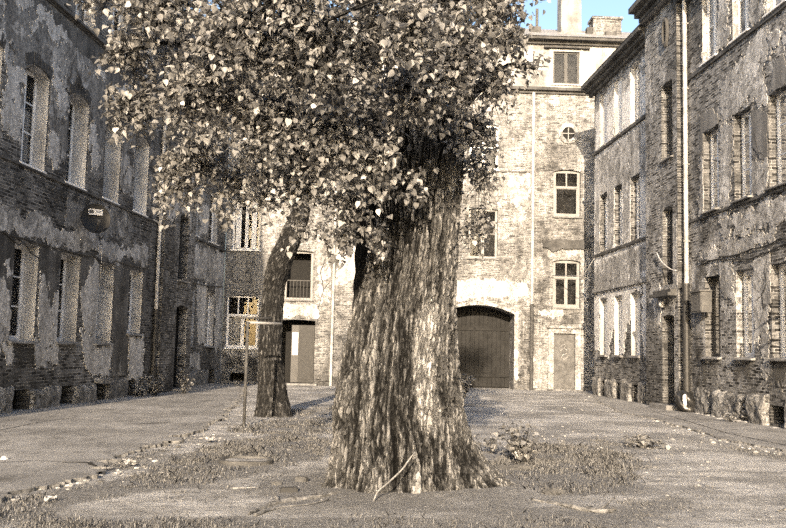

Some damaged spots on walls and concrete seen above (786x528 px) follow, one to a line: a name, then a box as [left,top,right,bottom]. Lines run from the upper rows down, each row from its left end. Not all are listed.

flaking render [0,0,157,198]
flaking render [0,193,149,381]
flaking render [456,277,548,388]
flaking render [696,22,786,393]